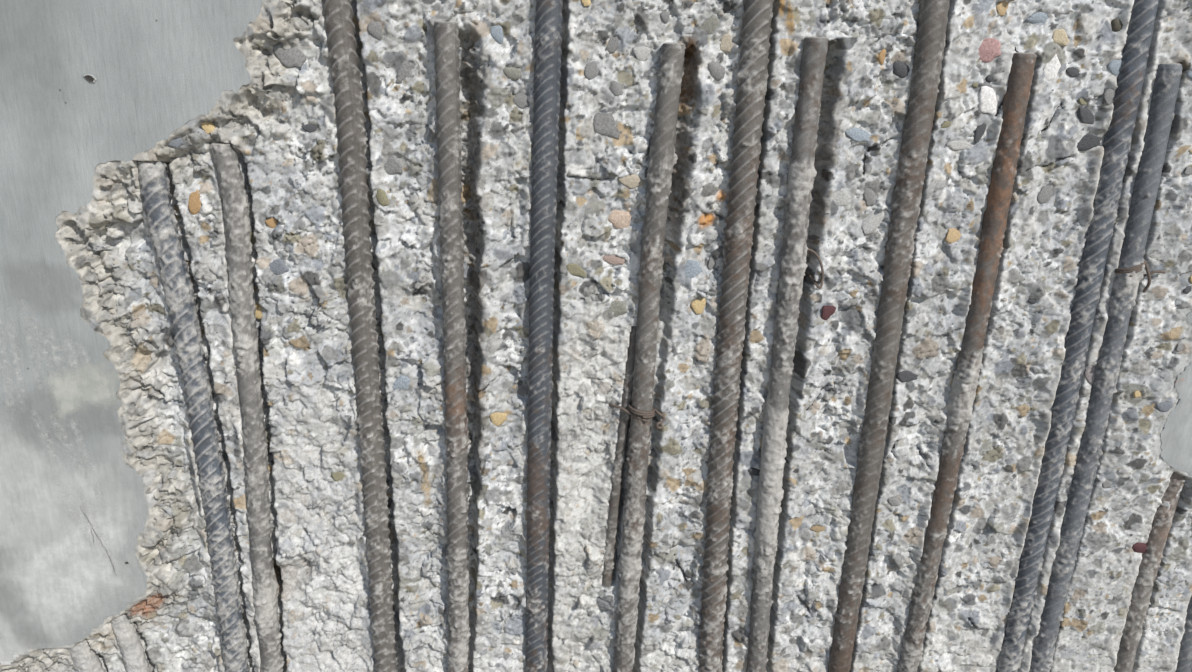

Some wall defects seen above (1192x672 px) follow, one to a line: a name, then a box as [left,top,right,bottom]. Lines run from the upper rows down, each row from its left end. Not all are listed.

spalling [0,0,563,672]
spalling [546,0,1192,672]